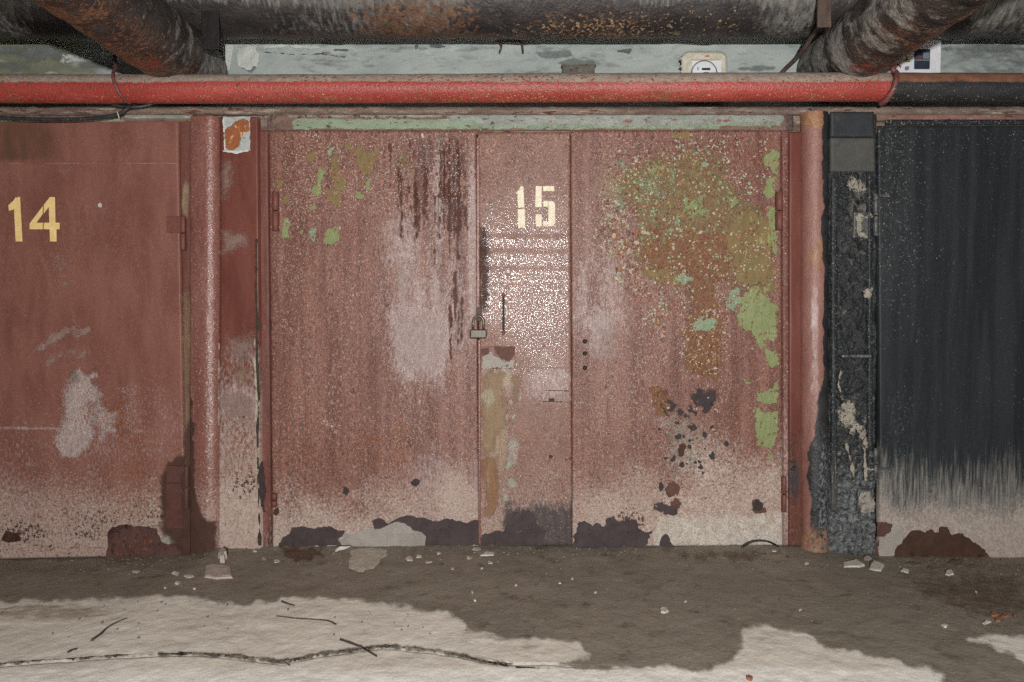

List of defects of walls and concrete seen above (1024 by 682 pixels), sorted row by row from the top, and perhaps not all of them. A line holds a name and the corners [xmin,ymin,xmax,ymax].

peeling [271,115,482,256]
spalling [847,175,868,193]
spalling [855,213,873,238]
peeling [593,121,781,462]
peeling [481,346,515,371]
leakage [54,370,149,492]
leakage [0,400,1024,682]